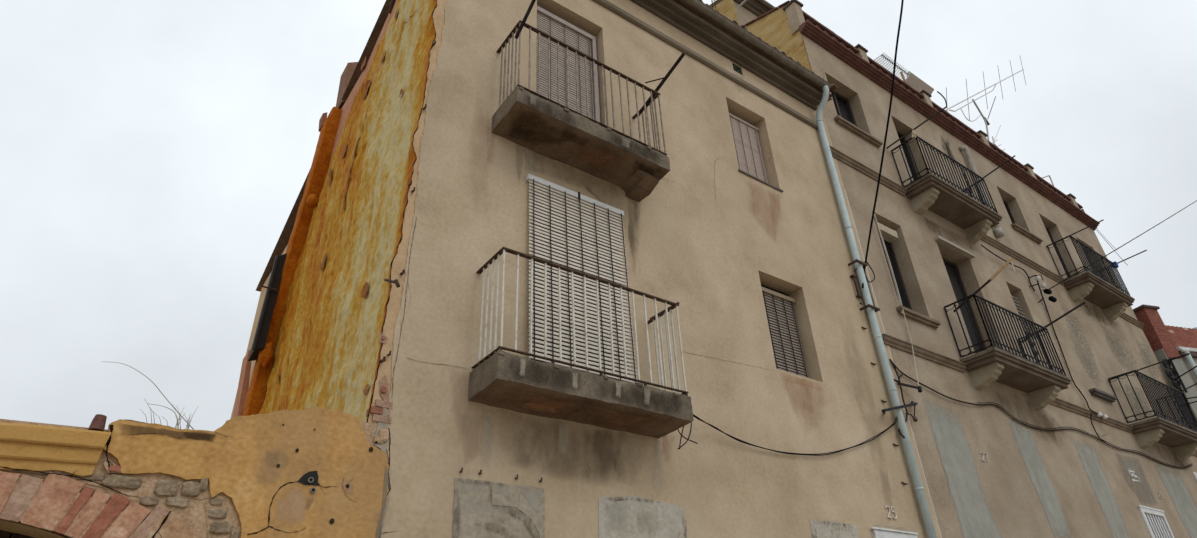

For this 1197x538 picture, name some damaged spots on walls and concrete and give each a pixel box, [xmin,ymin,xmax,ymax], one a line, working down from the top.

flaking render [366,374,393,452]
crack [385,430,393,496]
crack [247,475,357,535]